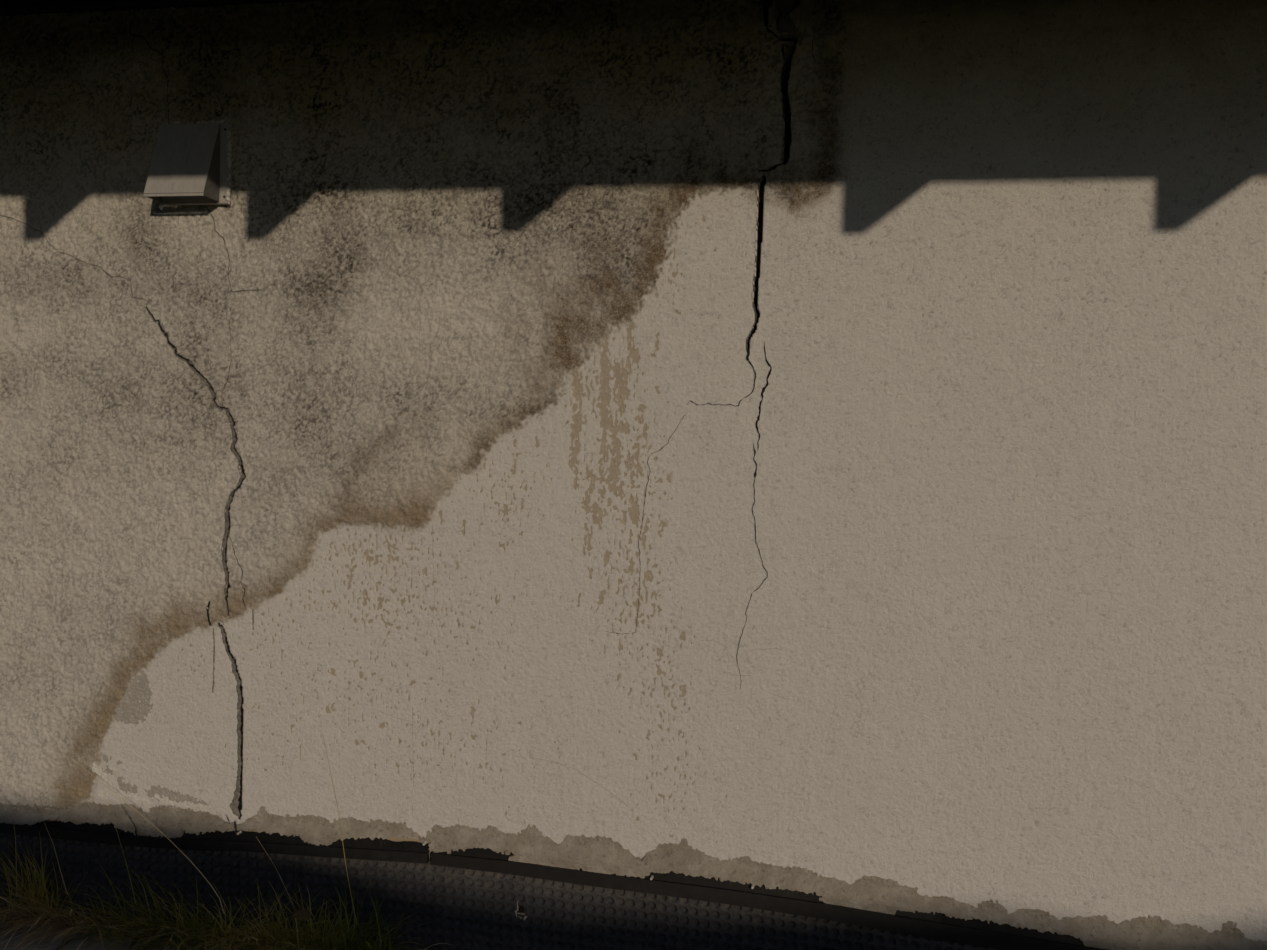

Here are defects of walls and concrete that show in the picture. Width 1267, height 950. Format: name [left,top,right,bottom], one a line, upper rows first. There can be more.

crack [0,206,246,833]
water stain [59,595,254,806]
peeling [157,433,552,796]
water stain [549,179,699,368]
peeling [564,321,714,838]
crack [605,39,797,689]